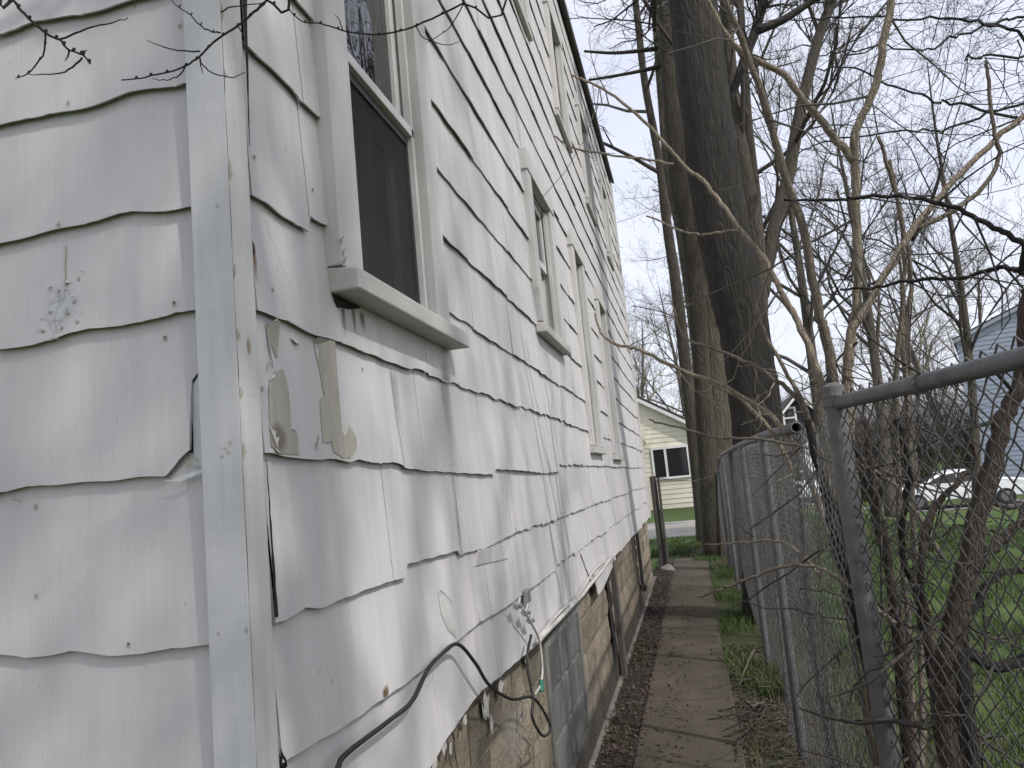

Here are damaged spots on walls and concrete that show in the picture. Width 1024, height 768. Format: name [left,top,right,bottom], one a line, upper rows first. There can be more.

peeling [266,318,300,455]
peeling [313,337,359,458]